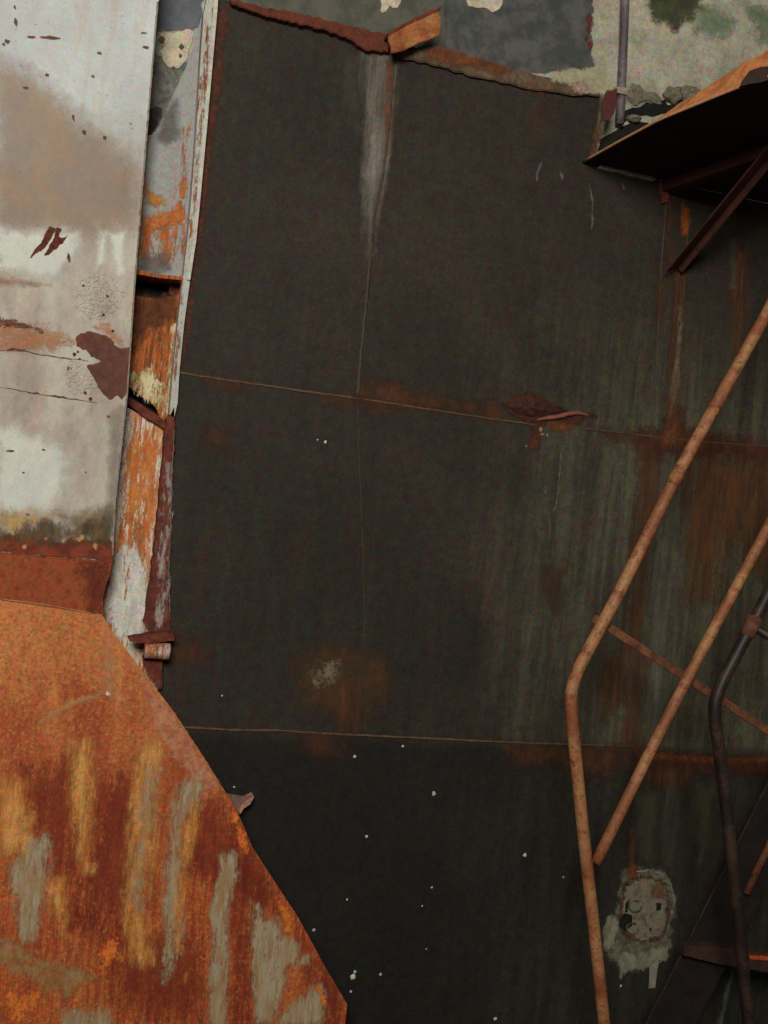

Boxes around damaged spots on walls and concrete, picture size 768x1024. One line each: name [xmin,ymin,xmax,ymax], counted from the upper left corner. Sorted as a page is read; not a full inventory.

water stain [0,73,128,226]
flaking render [141,29,194,70]
water stain [362,53,395,237]
peeling [234,0,614,95]
spalling [598,83,701,152]
corrosion [0,437,161,599]
corrosion [504,743,768,789]
corrosion [20,738,205,1022]
corrosion [183,802,294,1024]
spalling [603,828,677,989]
corrosion [5,987,43,1022]